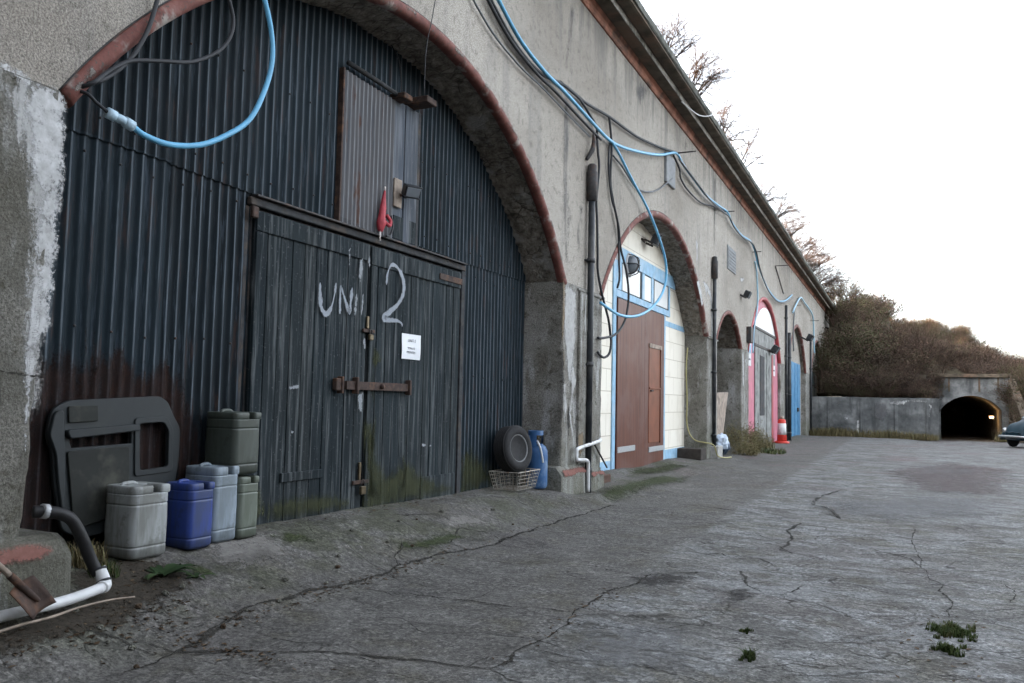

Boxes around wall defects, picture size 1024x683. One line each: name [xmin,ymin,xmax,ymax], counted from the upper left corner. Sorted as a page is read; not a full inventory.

corrosion [20,347,200,546]
crack [68,491,981,680]
crack [876,527,1021,617]